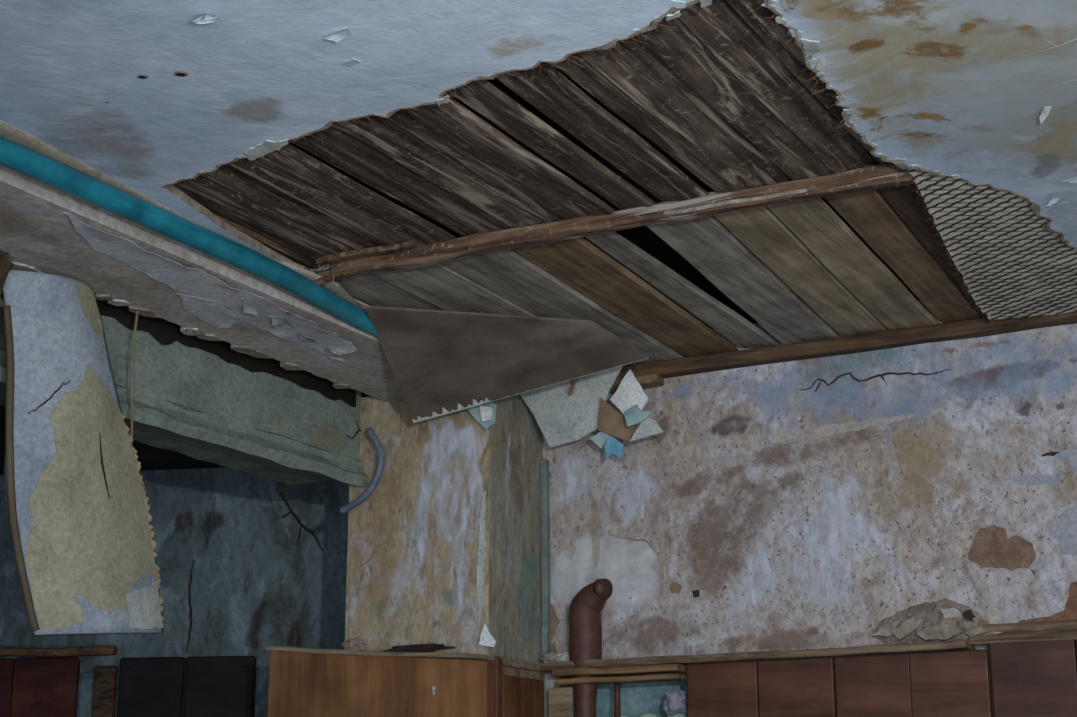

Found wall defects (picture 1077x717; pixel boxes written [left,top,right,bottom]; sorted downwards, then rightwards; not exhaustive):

peeling [325,27,351,43]
flaking render [655,1,686,21]
flaking render [761,0,960,179]
leakage [845,0,1077,166]
peeling [1039,106,1052,124]
flaking render [245,138,290,161]
peeling [63,212,357,370]
crack [799,369,951,392]
peeling [26,363,156,630]
leakage [417,421,483,610]
spalling [966,523,1040,576]
spalling [1017,581,1077,623]